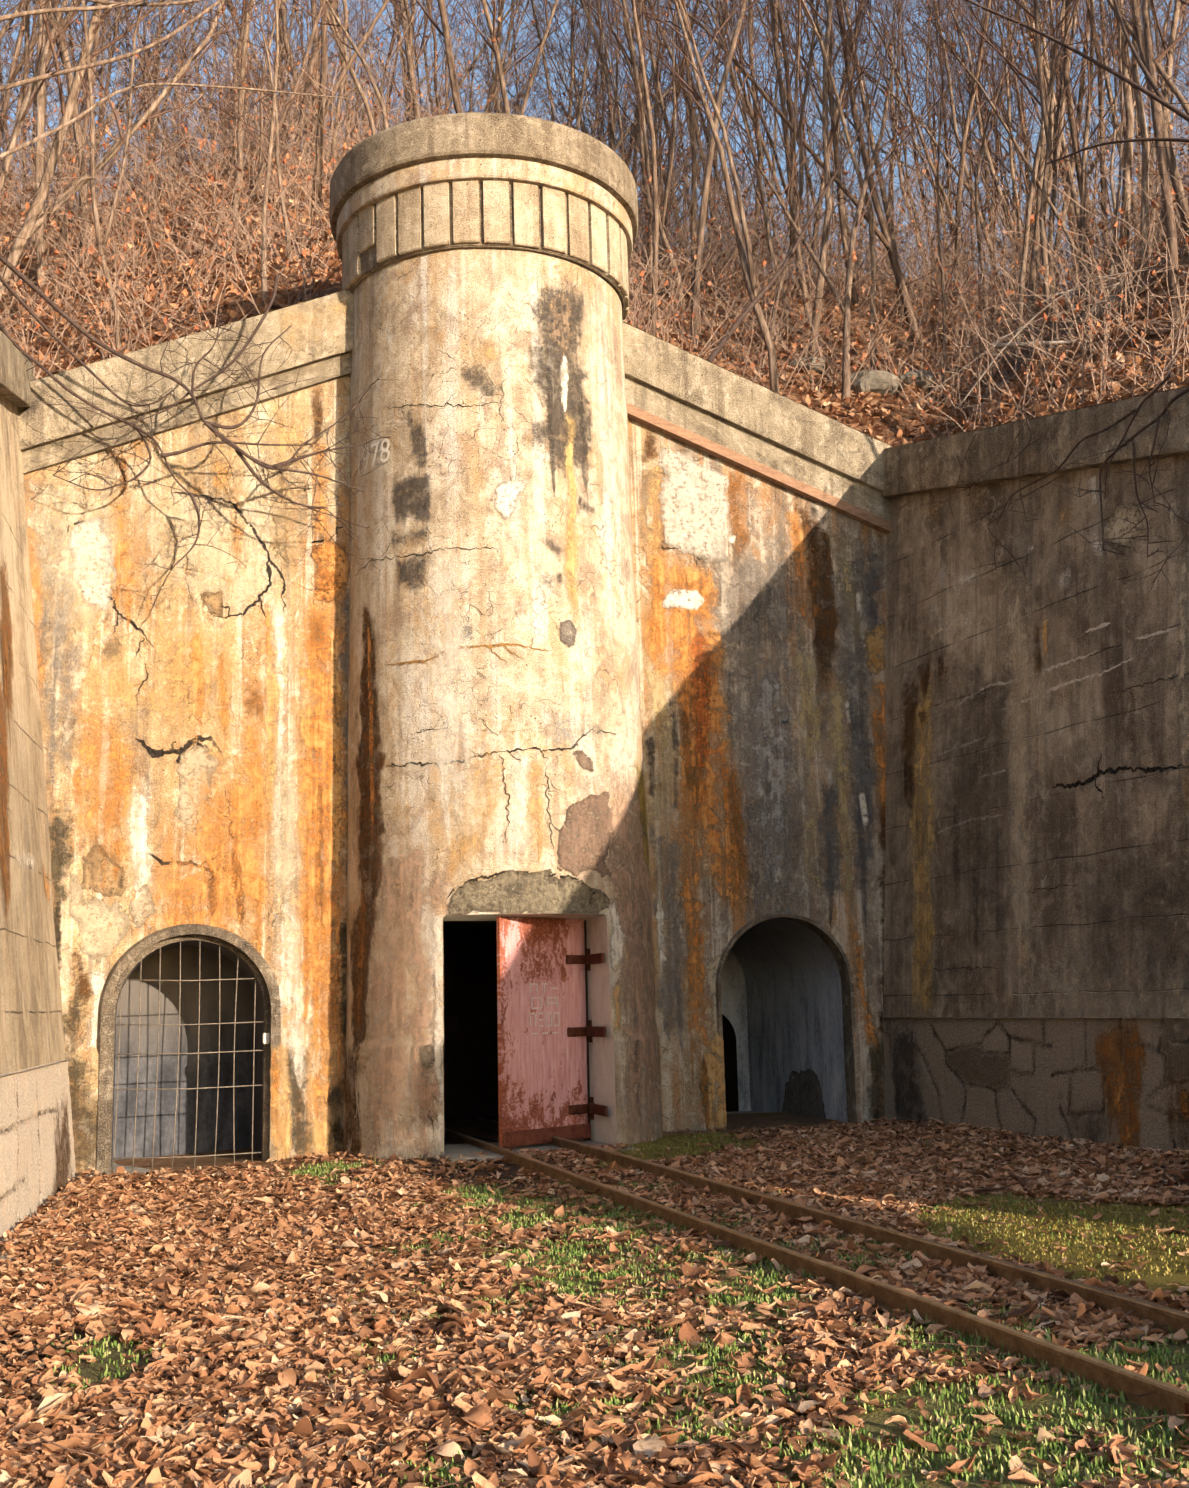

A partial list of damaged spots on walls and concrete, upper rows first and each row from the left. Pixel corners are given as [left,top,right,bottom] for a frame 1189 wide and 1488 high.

corrosion [312,392,330,549]
water stain [392,412,430,588]
water stain [529,283,594,614]
peeling [658,447,736,563]
crack [96,572,239,913]
corrosion [150,611,274,951]
corrosion [294,594,385,1100]
crack [386,710,620,900]
spalling [448,792,614,915]
peeling [574,750,594,772]
corrosion [644,551,748,911]
crack [1052,753,1183,798]